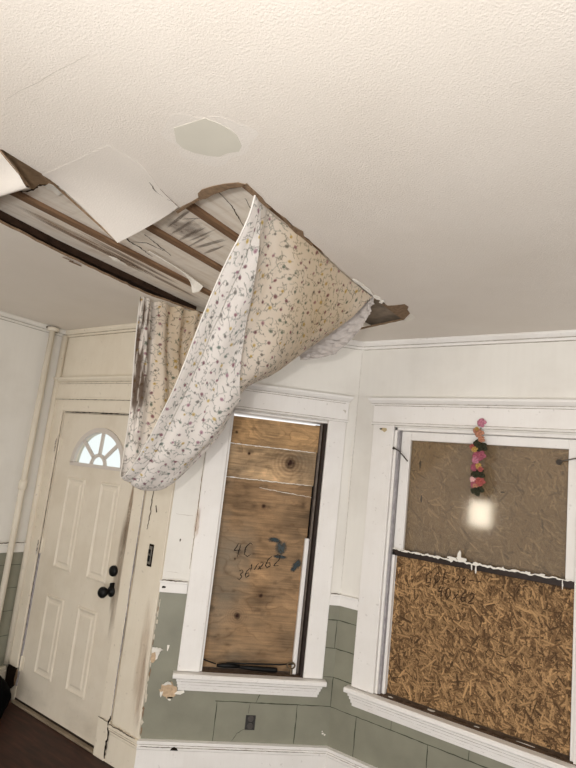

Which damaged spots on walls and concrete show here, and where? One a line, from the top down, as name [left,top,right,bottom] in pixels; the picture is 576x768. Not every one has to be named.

damp [170,214,221,253]
peeling [281,216,313,246]
peeling [382,304,410,320]
peeling [138,602,170,739]
flaking render [159,681,184,701]